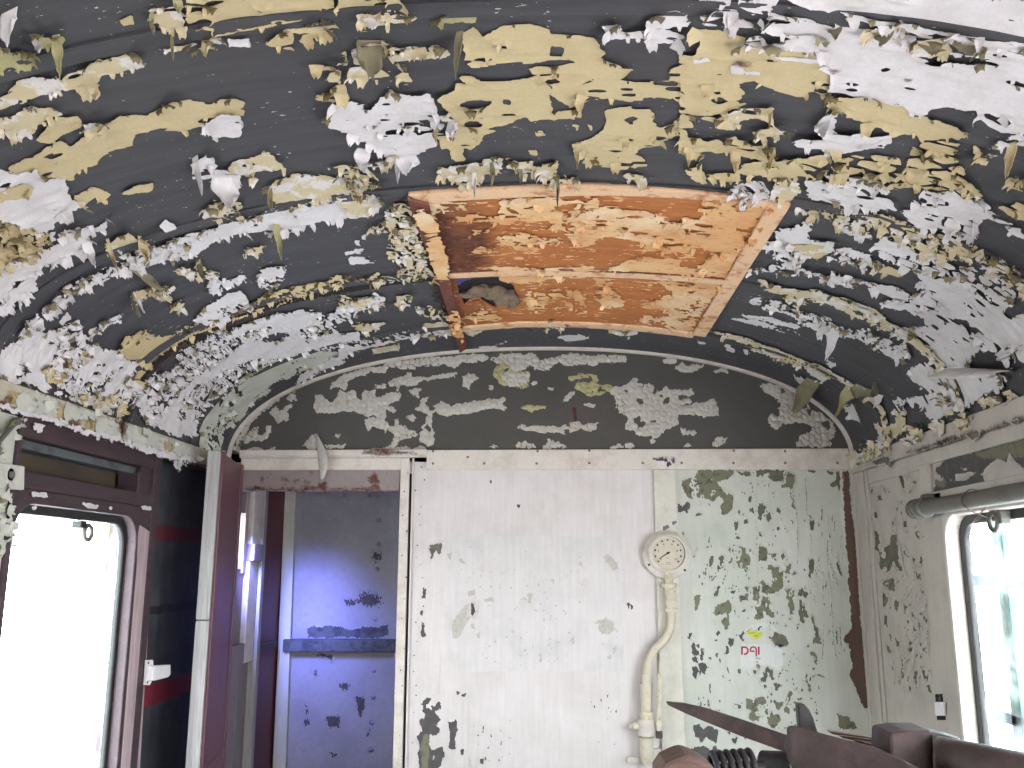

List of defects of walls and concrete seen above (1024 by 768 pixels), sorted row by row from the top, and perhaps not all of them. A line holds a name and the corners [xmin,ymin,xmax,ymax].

peeling [0,6,146,110]
peeling [147,0,417,61]
peeling [0,99,245,318]
peeling [435,156,503,199]
peeling [345,240,374,265]
peeling [638,280,722,336]
peeling [313,341,728,450]
peeling [933,439,1024,492]
peeling [0,484,20,559]
peeling [660,469,827,733]
peeling [414,695,464,768]
peeling [688,720,748,758]